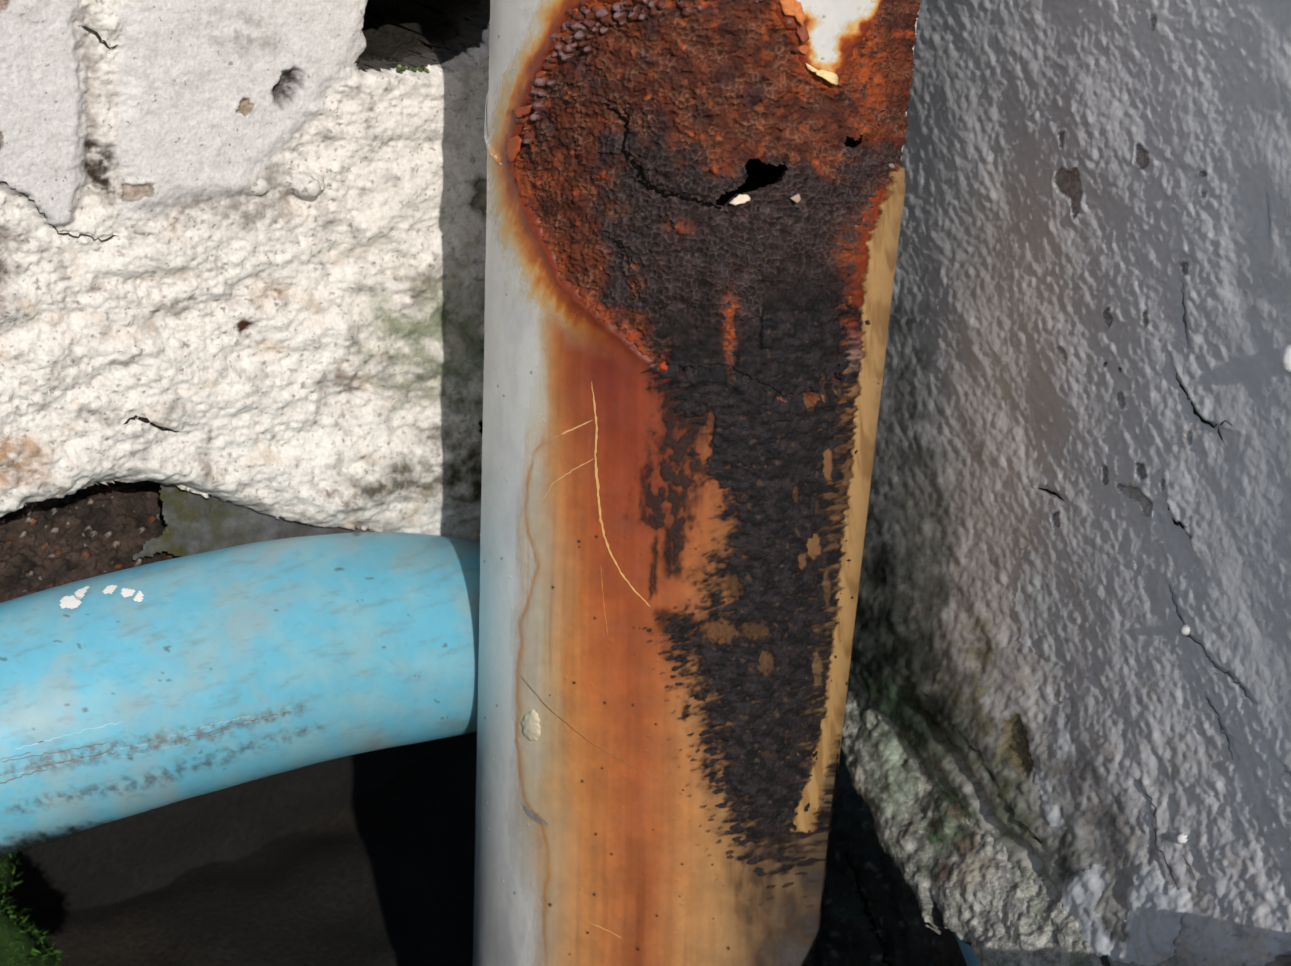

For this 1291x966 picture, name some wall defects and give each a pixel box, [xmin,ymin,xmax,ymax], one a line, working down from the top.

spalling [273,70,297,100]
spalling [356,0,481,74]
crack [0,181,117,242]
spalling [1053,167,1082,218]
crack [1175,285,1233,443]
crack [123,415,179,432]
rust [487,0,921,966]
leakage [851,436,967,750]
crack [1169,586,1255,759]
spalling [998,715,1067,831]
leakage [1060,834,1081,881]
peeling [1061,864,1191,966]